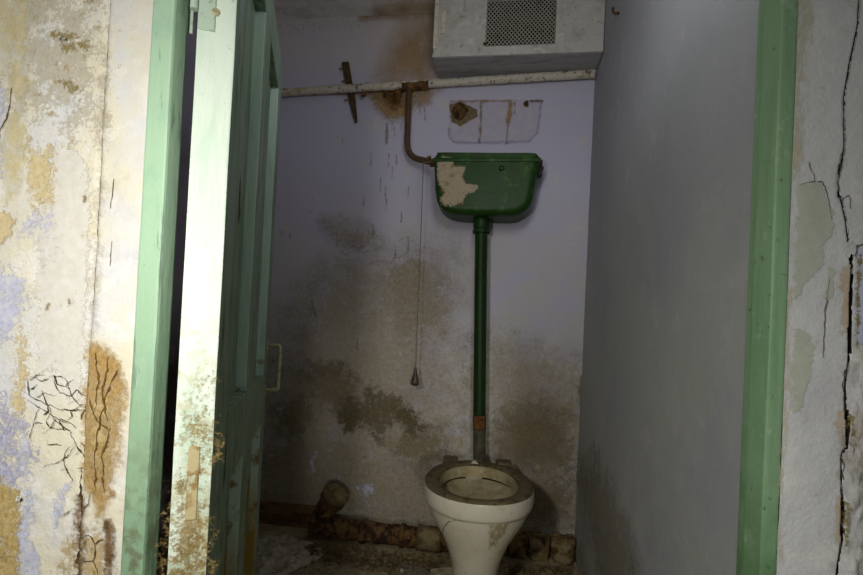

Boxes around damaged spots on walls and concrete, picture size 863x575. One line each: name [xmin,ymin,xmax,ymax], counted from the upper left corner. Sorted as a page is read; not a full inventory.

spalling [50,30,93,54]
corrosion [357,87,428,144]
spalling [449,101,478,127]
crack [800,5,863,247]
peeling [0,390,40,575]
peeling [0,142,92,404]
crack [27,375,103,575]
damp [264,264,446,524]
damp [489,359,578,530]
crack [822,279,830,358]
peeling [792,182,863,354]
crack [841,364,849,407]